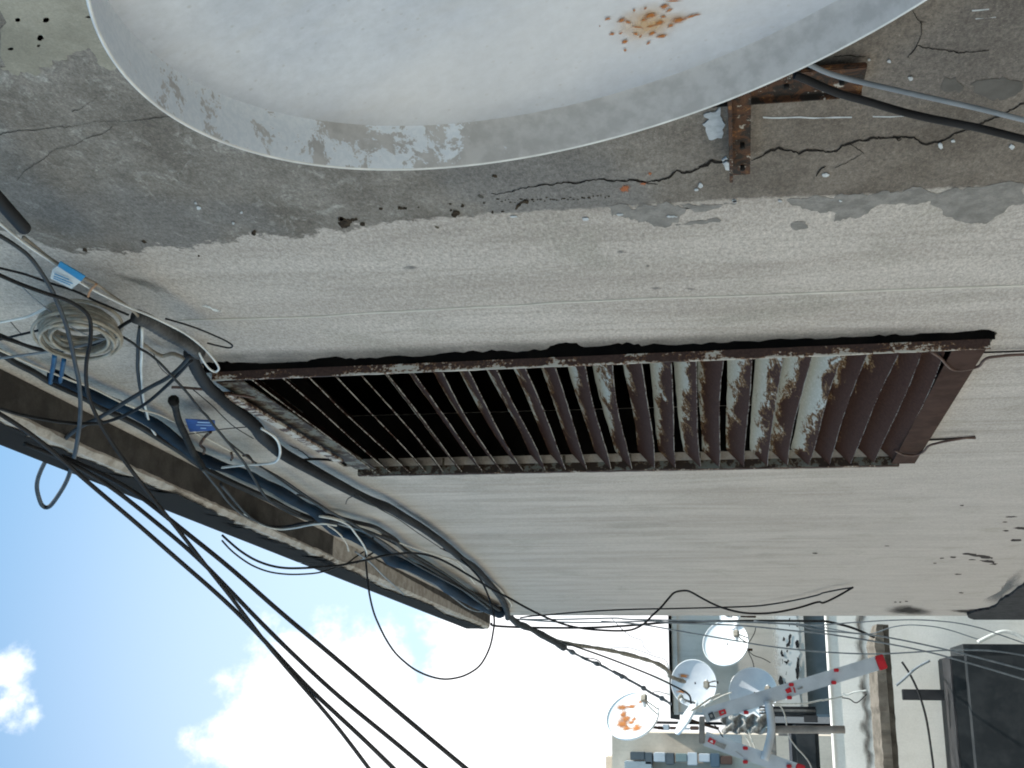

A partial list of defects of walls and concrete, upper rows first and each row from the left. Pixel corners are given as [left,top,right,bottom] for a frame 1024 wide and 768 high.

crack [908,9,989,57]
crack [0,99,169,180]
crack [493,103,1024,195]
spalling [338,217,365,228]
peeling [478,194,737,228]
peeling [778,181,1024,231]